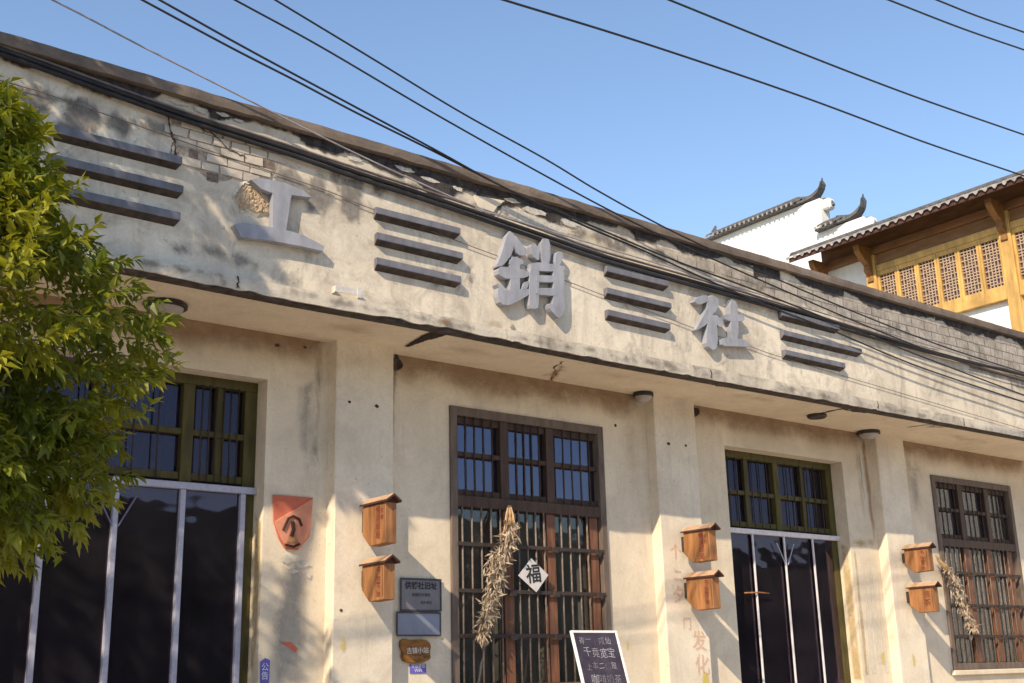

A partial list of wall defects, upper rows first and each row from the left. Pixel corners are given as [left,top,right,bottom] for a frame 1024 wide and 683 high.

peeling [165,99,287,218]
peeling [395,165,440,183]
peeling [452,186,580,235]